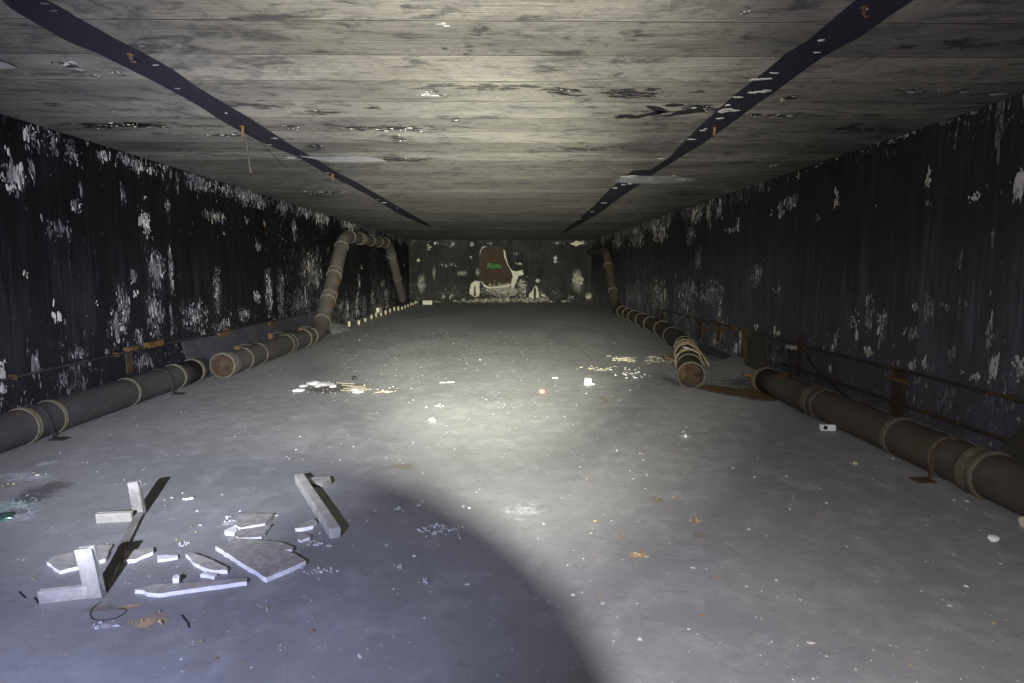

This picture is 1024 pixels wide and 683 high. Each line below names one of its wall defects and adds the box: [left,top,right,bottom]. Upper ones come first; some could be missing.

peeling [0,125,83,197]
peeling [184,172,286,223]
peeling [1000,167,1024,203]
peeling [105,196,166,355]
peeling [850,293,887,357]